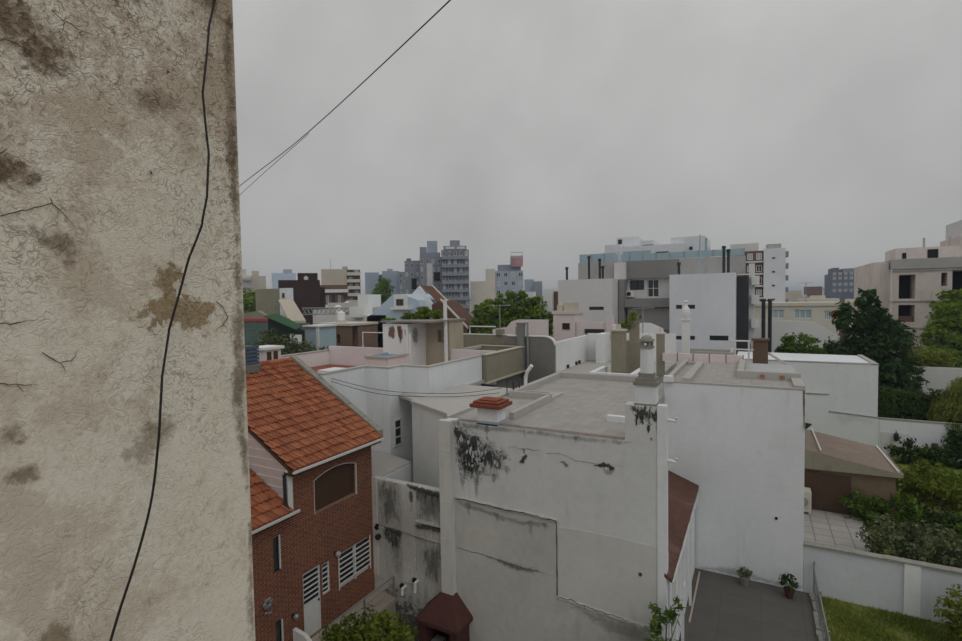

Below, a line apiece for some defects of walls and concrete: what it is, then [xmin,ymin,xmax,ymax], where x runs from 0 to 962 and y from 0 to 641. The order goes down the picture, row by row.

damp [0,0,74,75]
damp [227,124,239,211]
damp [233,310,246,467]
damp [630,406,657,441]
damp [407,484,440,506]
damp [384,527,402,548]
damp [416,524,440,533]